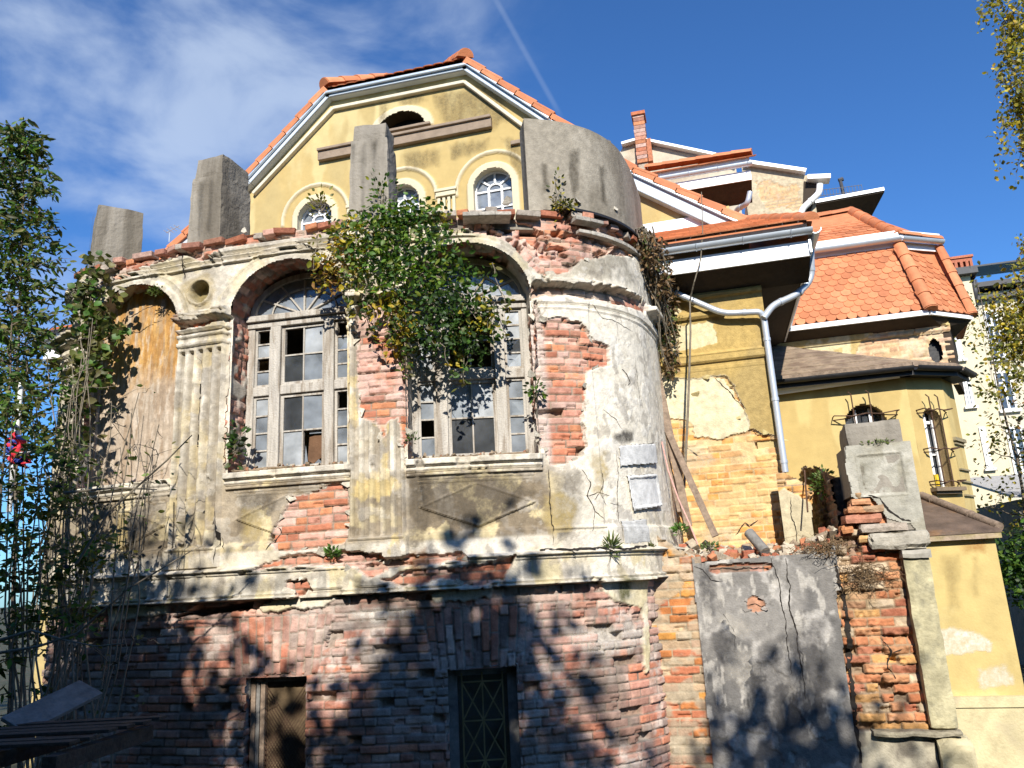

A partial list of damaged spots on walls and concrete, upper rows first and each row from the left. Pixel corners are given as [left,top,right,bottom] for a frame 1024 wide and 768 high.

spalling [353,291,415,448]
spalling [444,218,652,466]
spalling [255,481,517,596]
crack [540,456,650,554]
spalling [661,373,814,548]
crack [694,501,806,700]
spalling [744,595,769,614]